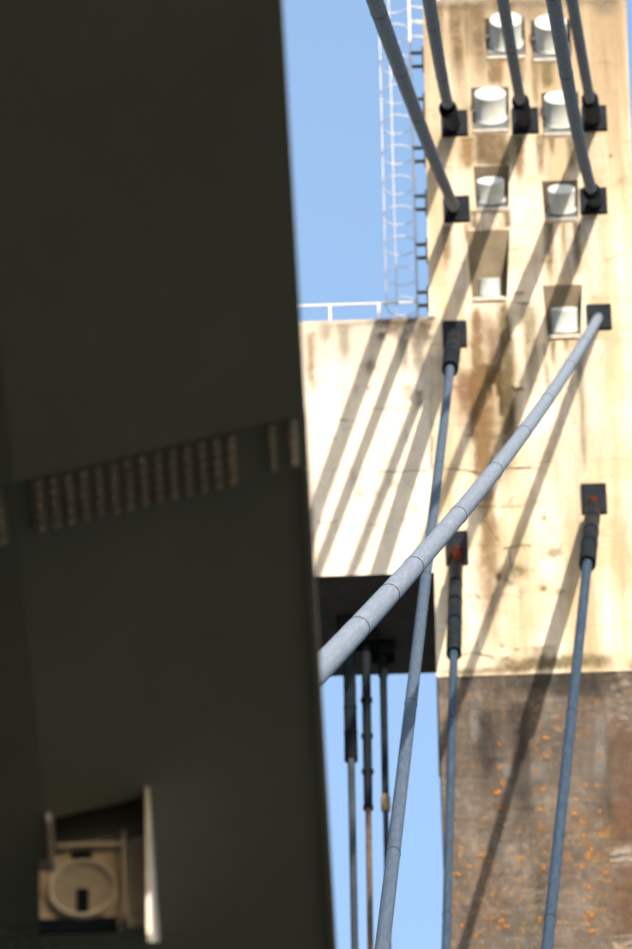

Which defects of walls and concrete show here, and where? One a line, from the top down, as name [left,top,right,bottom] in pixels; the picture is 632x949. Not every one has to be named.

leakage [450,4,502,81]
leakage [542,63,552,84]
leakage [484,304,523,444]
leakage [503,655,606,686]